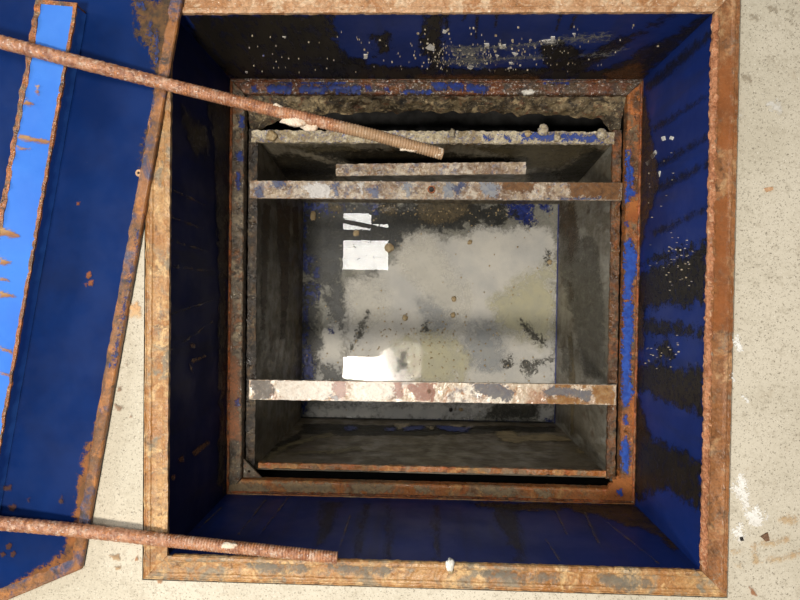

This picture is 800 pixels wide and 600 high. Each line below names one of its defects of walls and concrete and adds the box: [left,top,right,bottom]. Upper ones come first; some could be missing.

corrosion [131,0,171,75]
leakage [329,14,712,89]
peeling [483,131,604,143]
peeling [624,149,638,205]
corrosion [626,95,659,247]
corrosion [559,202,580,258]
corrosion [226,299,241,441]
peeling [619,238,637,474]
leakage [642,317,705,363]
corrosion [629,393,638,433]
corrosion [73,422,96,523]
corrosion [12,537,76,584]